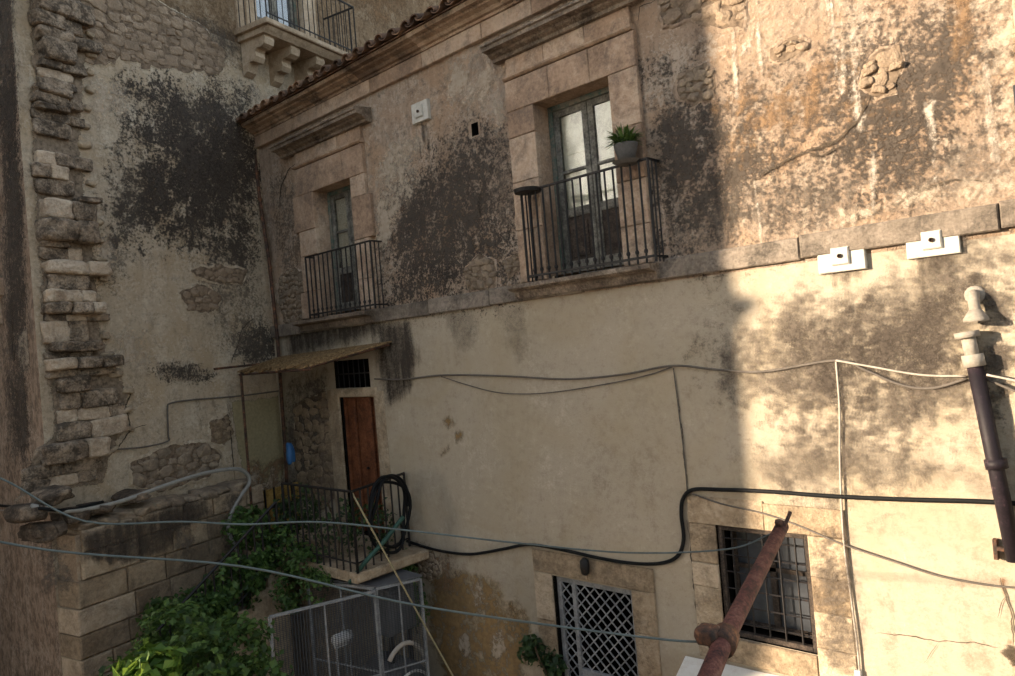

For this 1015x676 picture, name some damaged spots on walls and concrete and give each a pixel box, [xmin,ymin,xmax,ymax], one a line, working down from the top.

water stain [0,0,31,477]
spalling [14,0,227,501]
water stain [94,69,300,371]
spalling [178,262,249,315]
peeling [128,387,335,512]
water stain [286,322,415,404]
water stain [376,113,520,306]
peeling [657,0,753,35]
water stain [638,0,1015,258]
water stain [712,237,1013,510]
spalling [856,42,908,103]
crack [883,579,1014,662]